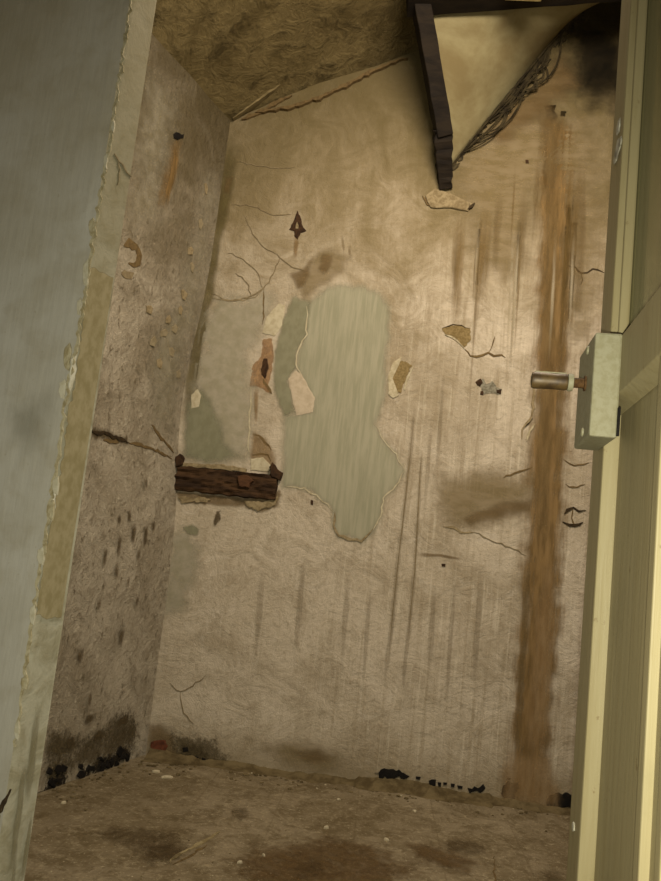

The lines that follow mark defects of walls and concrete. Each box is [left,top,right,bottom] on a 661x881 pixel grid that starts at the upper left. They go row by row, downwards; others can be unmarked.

spalling [442,324,471,348]
crack [92,425,174,459]
peeling [178,286,414,543]
damp [44,710,139,791]
crack [0,789,12,817]
damp [12,725,37,881]